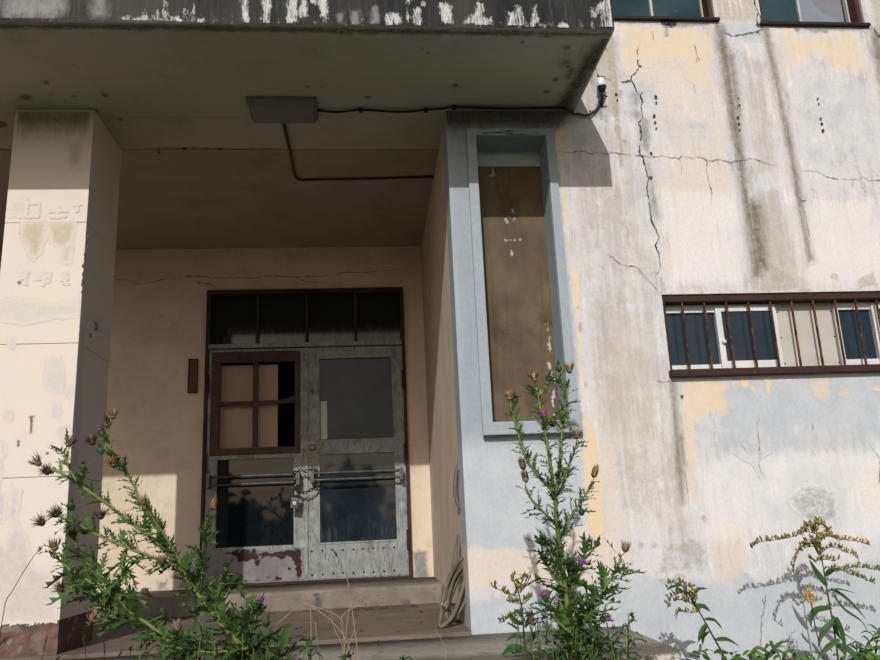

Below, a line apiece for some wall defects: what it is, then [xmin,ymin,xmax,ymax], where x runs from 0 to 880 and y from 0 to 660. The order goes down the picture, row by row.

crack [725,0,763,36]
leakage [0,0,775,285]
crack [558,33,777,289]
leakage [758,25,880,267]
crack [795,170,880,236]
peeling [808,376,852,404]
corrosion [224,547,303,581]